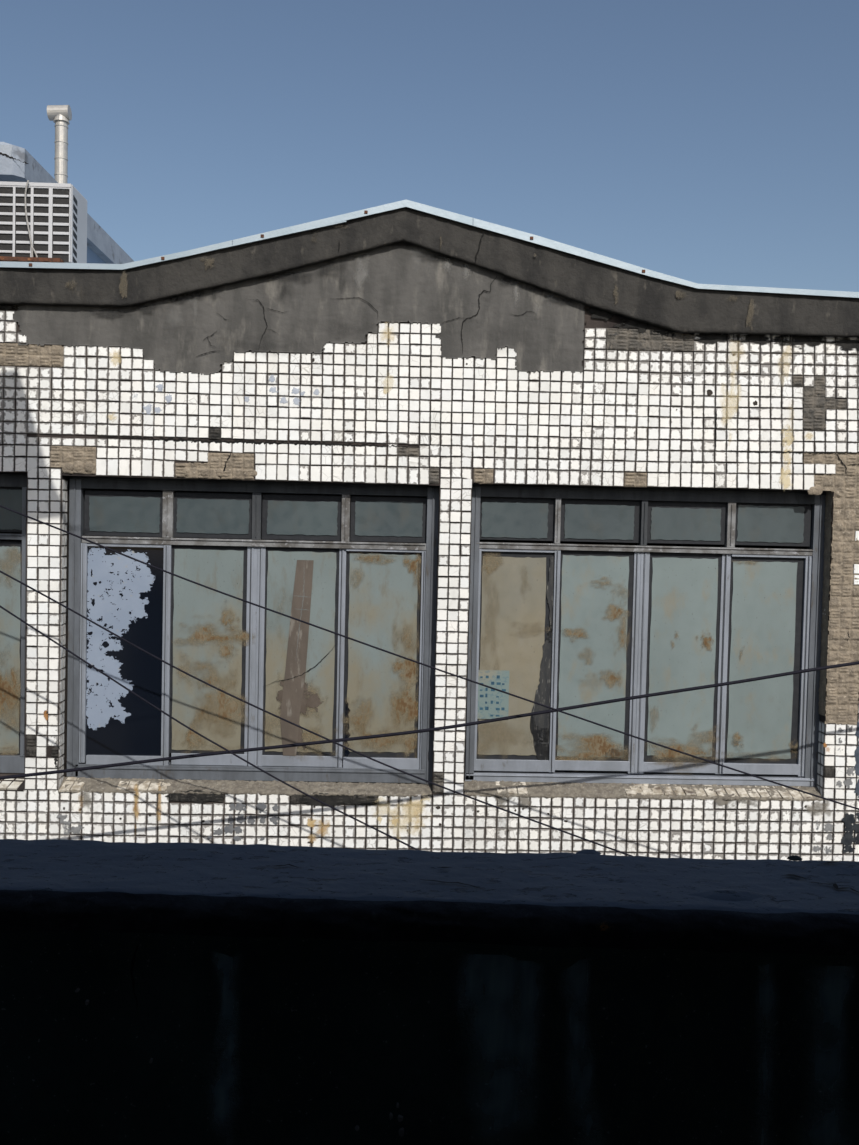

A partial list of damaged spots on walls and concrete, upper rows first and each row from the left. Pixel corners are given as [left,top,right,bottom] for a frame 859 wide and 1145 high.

crack [443,229,497,354]
peeling [0,343,64,367]
peeling [792,376,847,431]